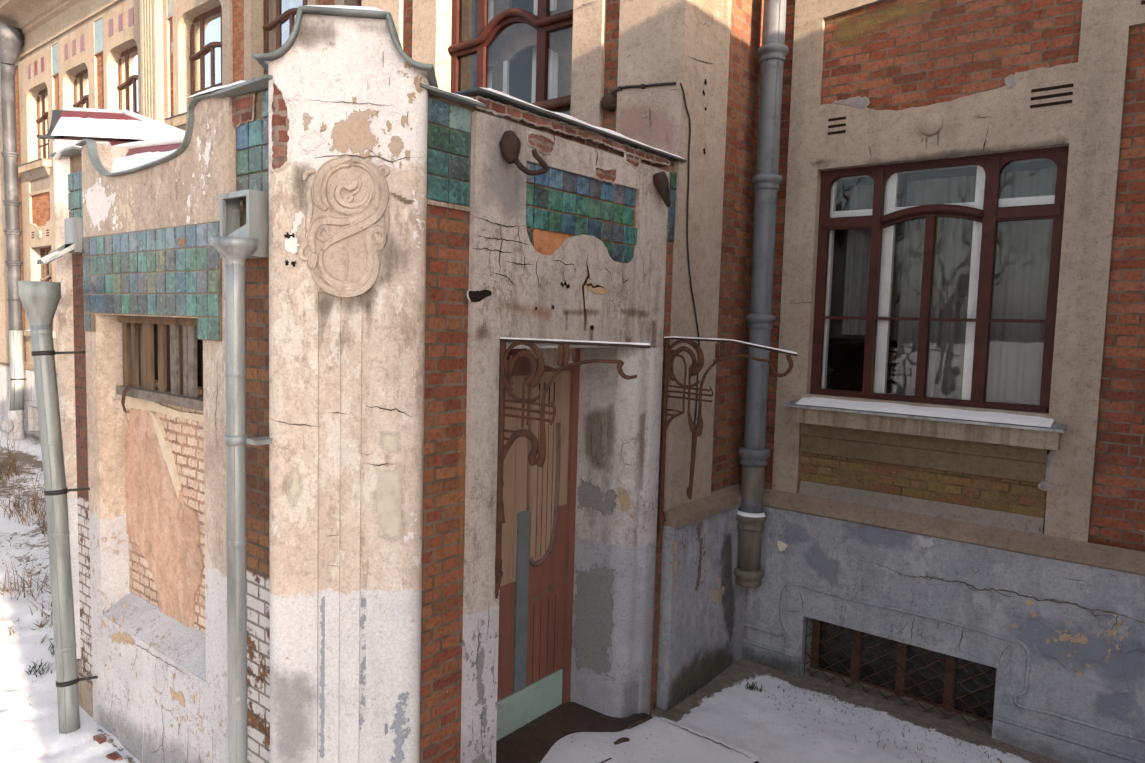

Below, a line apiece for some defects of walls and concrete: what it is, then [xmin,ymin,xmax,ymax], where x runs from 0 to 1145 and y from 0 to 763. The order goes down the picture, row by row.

flaking render [269,55,425,174]
peeling [82,175,142,232]
crack [473,216,644,321]
damp [586,409,613,467]
flaking render [125,396,204,629]
crack [861,560,1145,695]
peeling [1027,599,1126,676]
peeling [384,692,411,763]